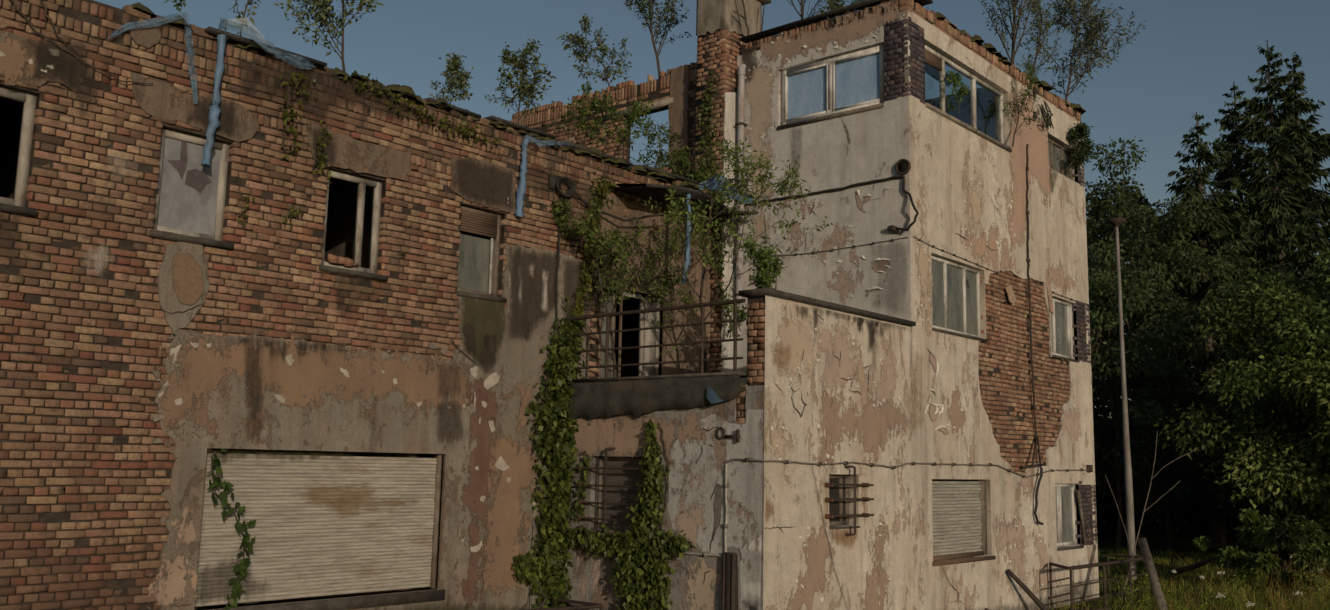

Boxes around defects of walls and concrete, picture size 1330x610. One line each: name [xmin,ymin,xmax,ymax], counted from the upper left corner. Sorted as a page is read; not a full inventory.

peeling [744,0,908,304]
damp [247,342,340,429]
peeling [143,329,539,610]
damp [463,248,597,372]
peeling [568,411,759,610]
peeling [764,518,835,610]
peeling [771,308,909,472]
peeling [858,507,911,610]
peeling [915,233,966,445]
flaking render [961,84,1081,474]